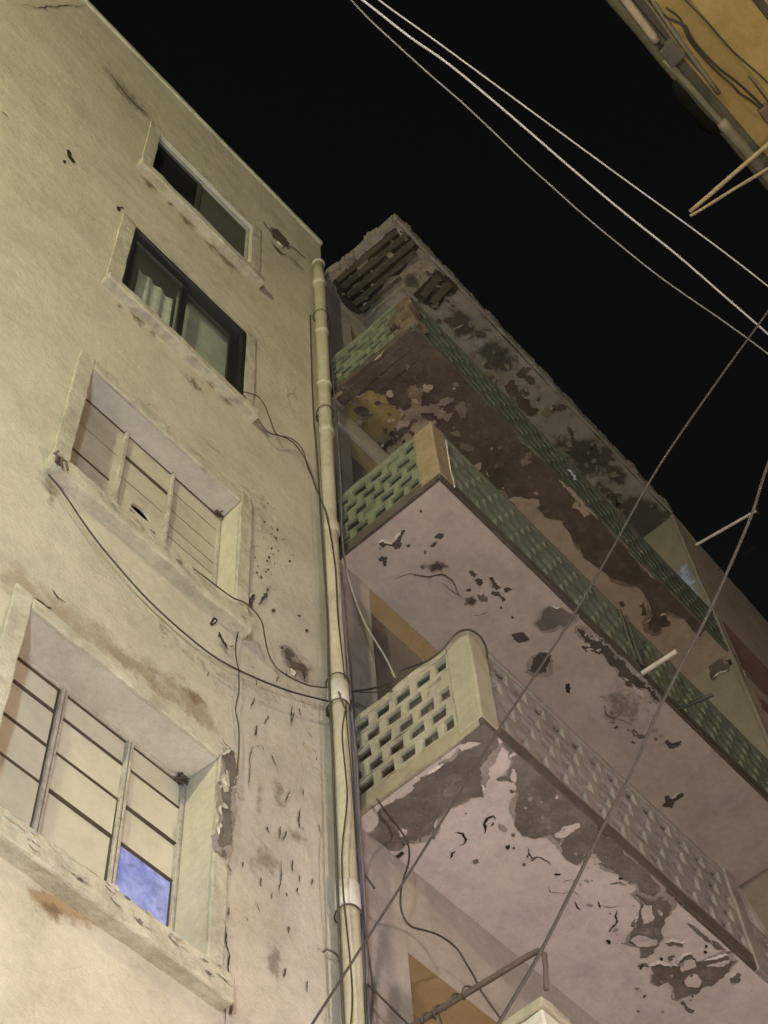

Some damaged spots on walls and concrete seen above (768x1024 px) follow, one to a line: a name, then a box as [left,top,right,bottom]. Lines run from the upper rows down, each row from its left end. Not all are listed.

spalling [263,222,306,258]
damp [417,271,568,416]
peeling [325,213,706,637]
damp [550,425,670,537]
peeling [110,497,276,619]
crack [396,573,463,598]
spalling [211,740,313,899]
crack [450,815,496,864]
peeling [367,724,741,1014]
crack [506,845,627,932]